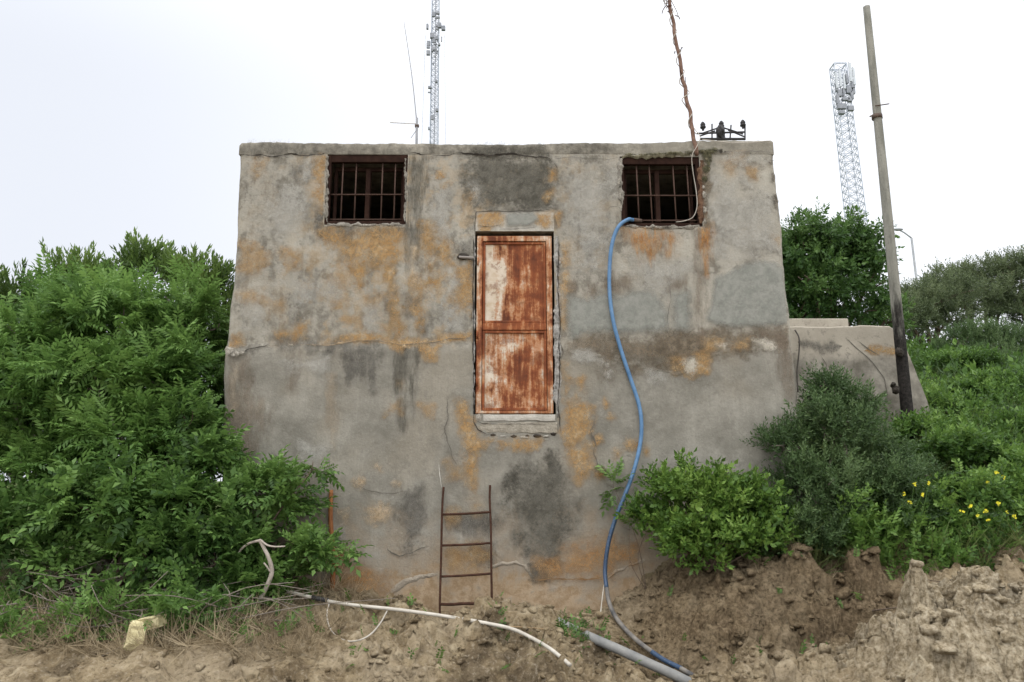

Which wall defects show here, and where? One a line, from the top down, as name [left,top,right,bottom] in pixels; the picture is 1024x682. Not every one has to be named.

water stain [461,146,559,213]
crack [305,209,587,466]
water stain [505,451,577,583]